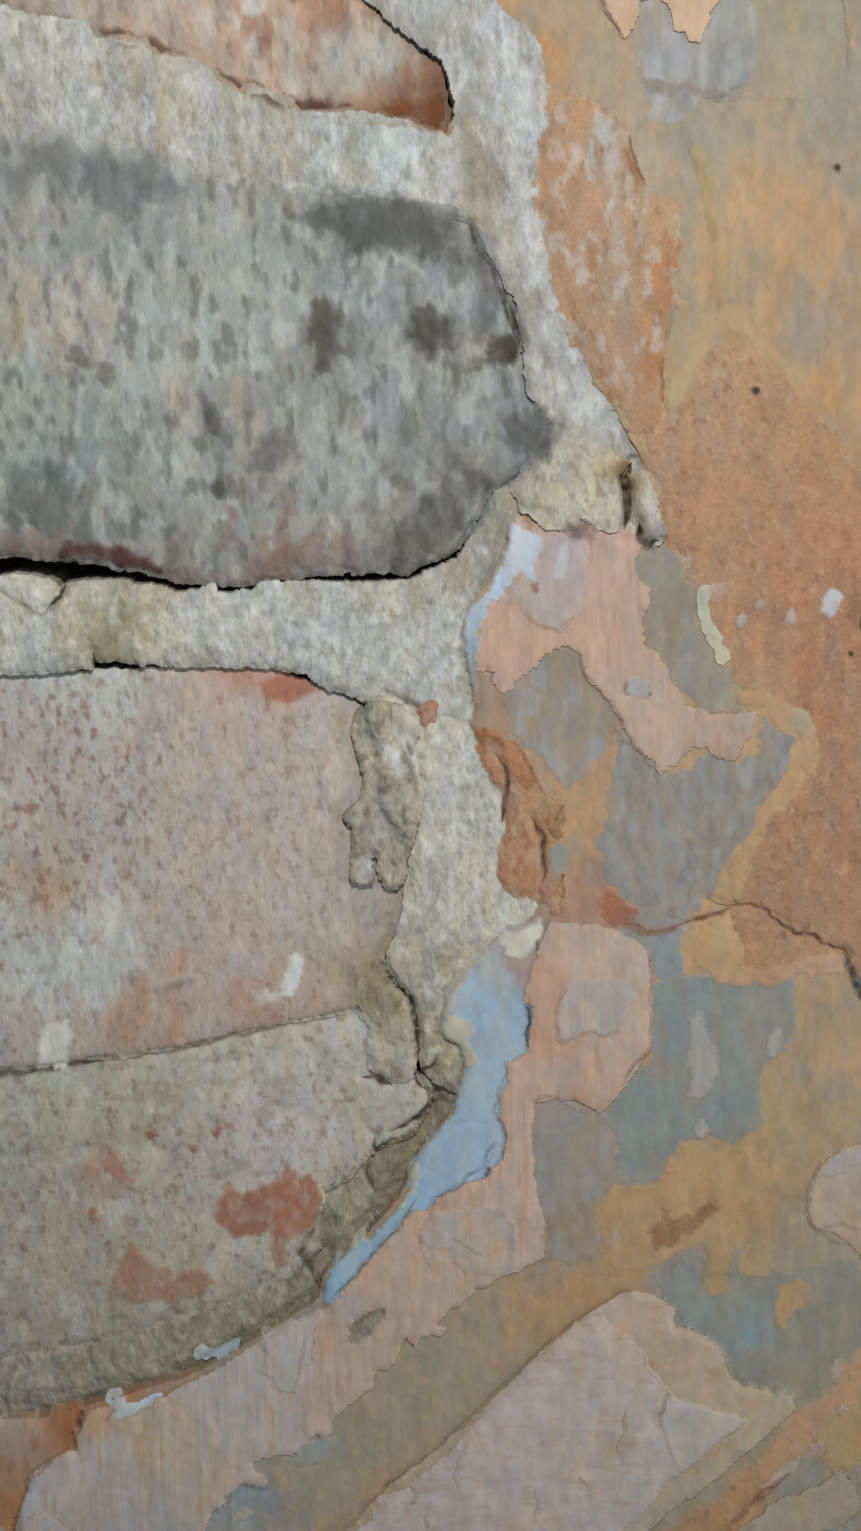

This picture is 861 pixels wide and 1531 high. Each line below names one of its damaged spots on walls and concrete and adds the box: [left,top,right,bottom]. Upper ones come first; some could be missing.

peeling [602,0,759,127]
flaking render [459,86,861,1280]
crack [624,898,861,1000]
crack [0,1011,357,1079]
peeling [0,914,655,1531]
peeling [346,1289,796,1531]
peeling [737,1466,861,1531]